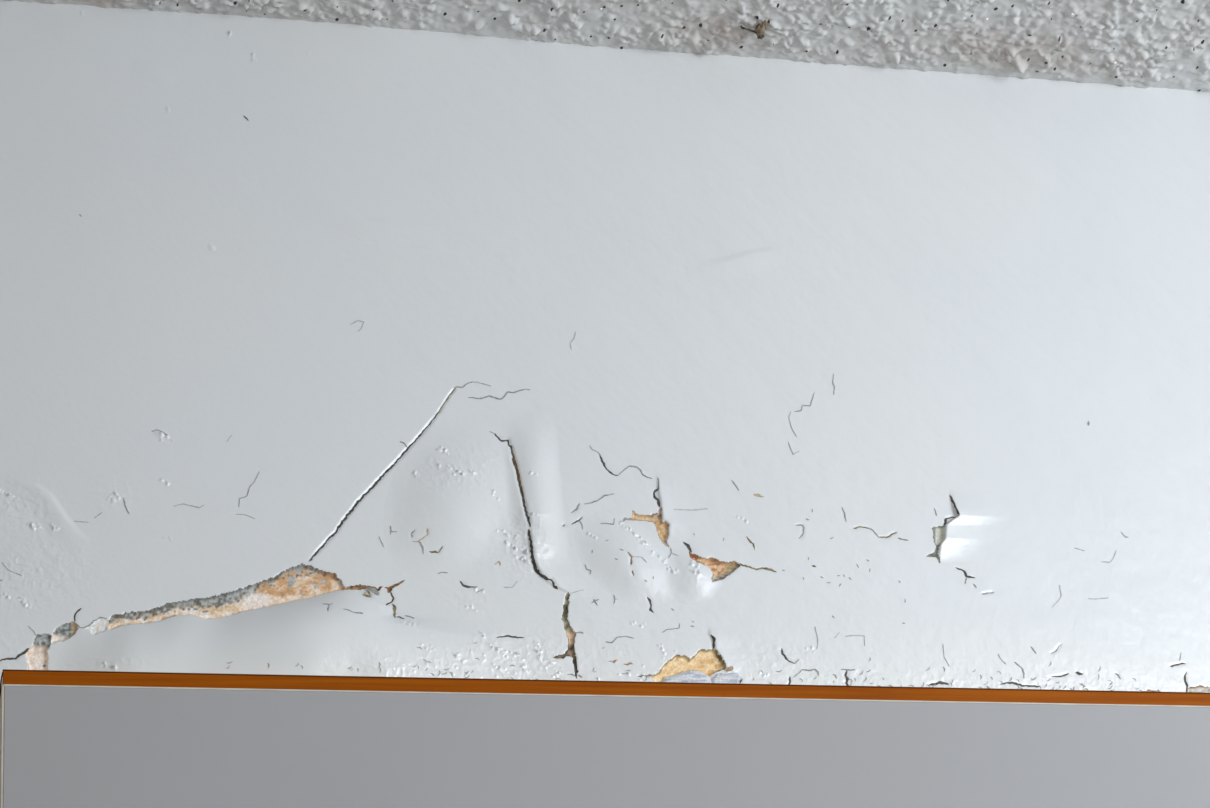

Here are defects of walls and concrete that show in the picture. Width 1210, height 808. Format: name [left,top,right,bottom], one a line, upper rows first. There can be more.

spalling [25,563,392,670]
crack [323,580,413,619]
crack [309,381,530,561]
crack [379,431,707,678]
spalling [644,621,782,684]
crack [934,496,960,525]